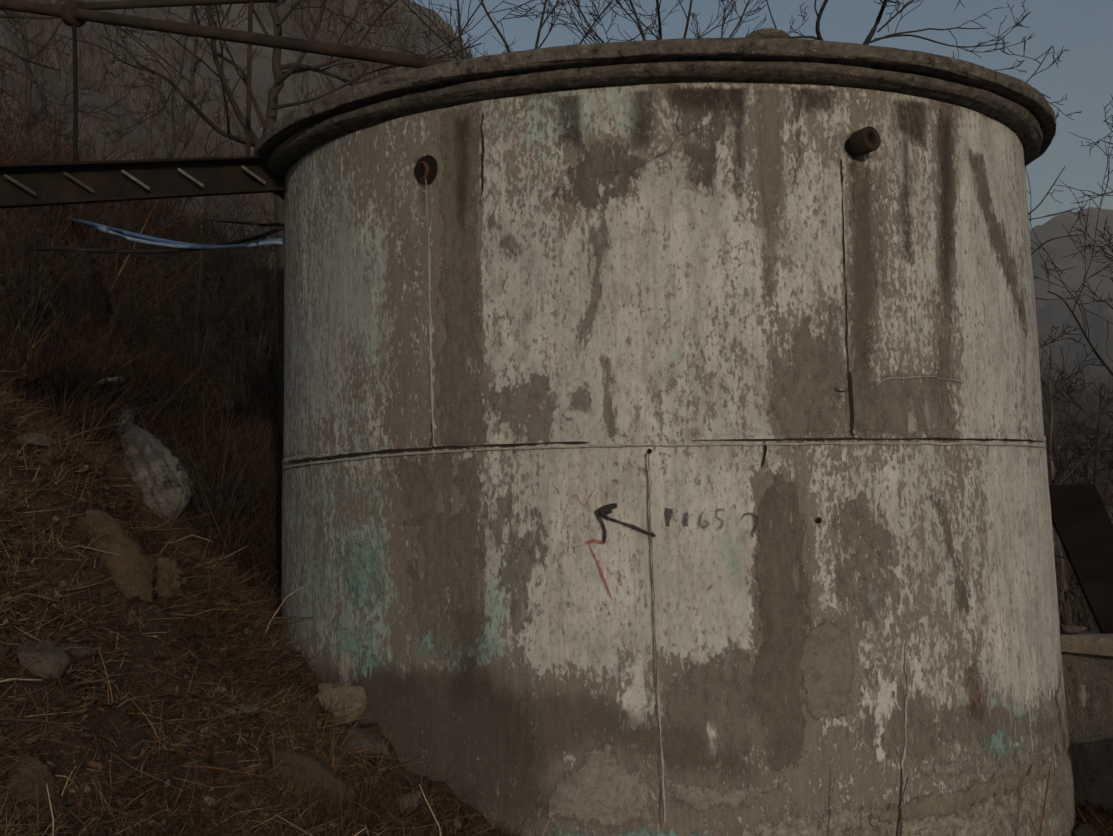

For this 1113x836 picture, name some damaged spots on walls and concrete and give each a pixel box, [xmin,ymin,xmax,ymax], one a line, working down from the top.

water stain [562,96,580,142]
water stain [673,89,743,132]
peeling [488,354,625,453]
peeling [551,139,647,349]
crack [690,159,1044,467]
peeling [844,103,957,447]
peeling [968,149,1030,336]
peeling [387,453,549,680]
peeling [663,474,812,771]
peeling [832,492,910,629]
spalling [736,767,1064,836]
peeling [846,665,1065,764]